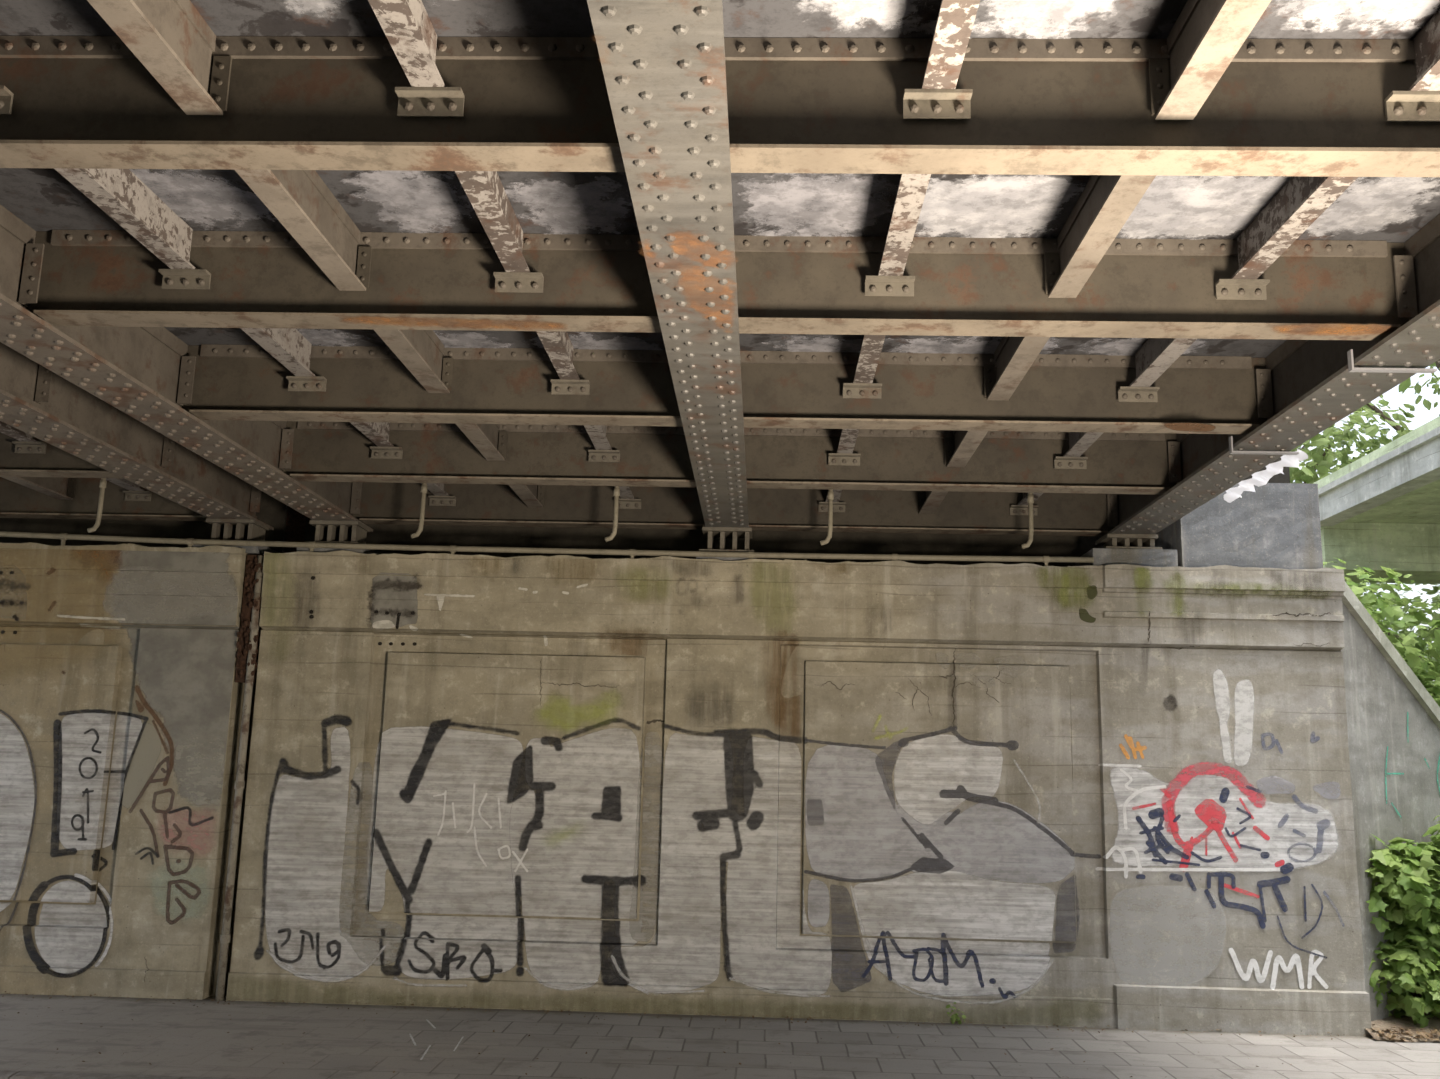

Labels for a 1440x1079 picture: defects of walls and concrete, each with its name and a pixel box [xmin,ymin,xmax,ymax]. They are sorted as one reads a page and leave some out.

rust [235,555,264,683]
crack [896,649,1010,727]